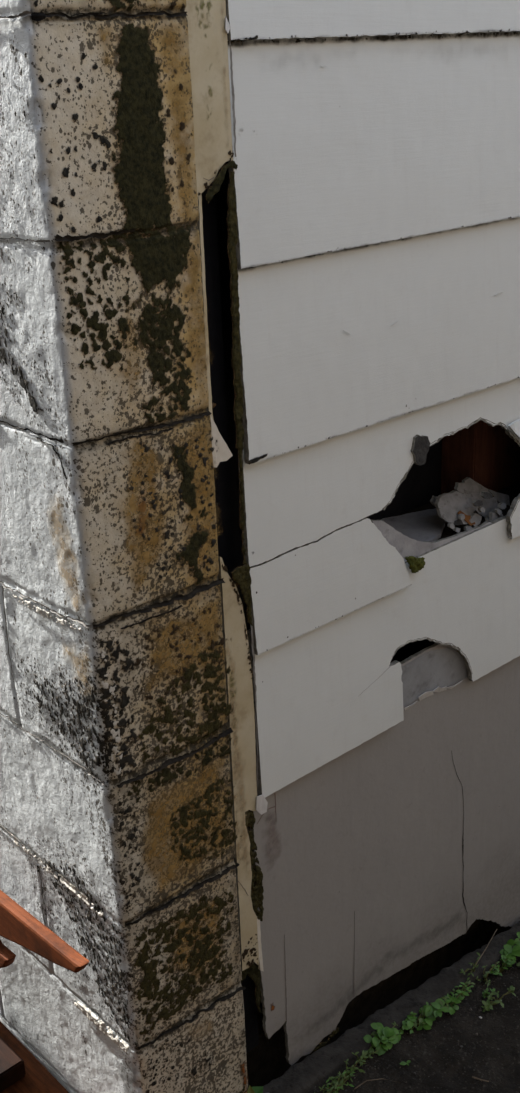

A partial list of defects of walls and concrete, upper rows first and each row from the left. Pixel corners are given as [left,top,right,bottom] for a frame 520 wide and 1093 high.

water stain [0,45,44,239]
water stain [0,247,56,428]
water stain [51,505,78,608]
water stain [186,432,217,565]
peeling [210,415,233,467]
water stain [14,647,125,793]
water stain [144,766,223,885]
crack [452,757,467,926]
water stain [25,837,140,1049]
water stain [171,903,219,972]